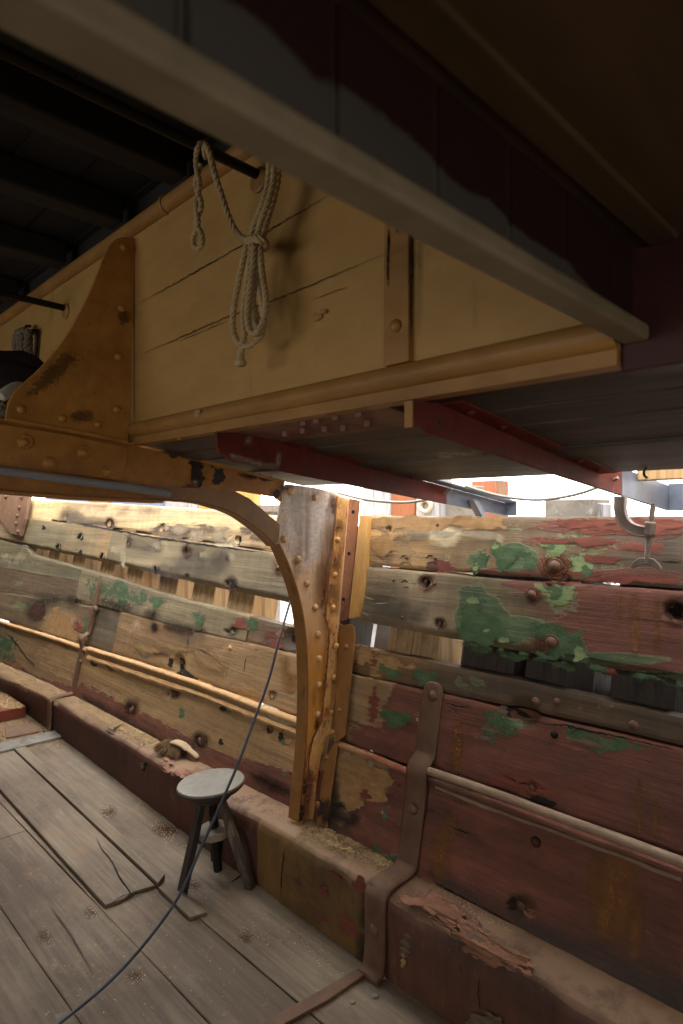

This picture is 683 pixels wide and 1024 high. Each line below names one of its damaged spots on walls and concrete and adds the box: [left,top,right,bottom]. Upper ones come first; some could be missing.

crack [141,229,414,353]
peeling [370,514,683,607]
peeling [456,593,683,692]
peeling [566,723,649,754]
peeling [335,748,395,820]
crack [96,837,144,903]
peeling [397,889,490,934]